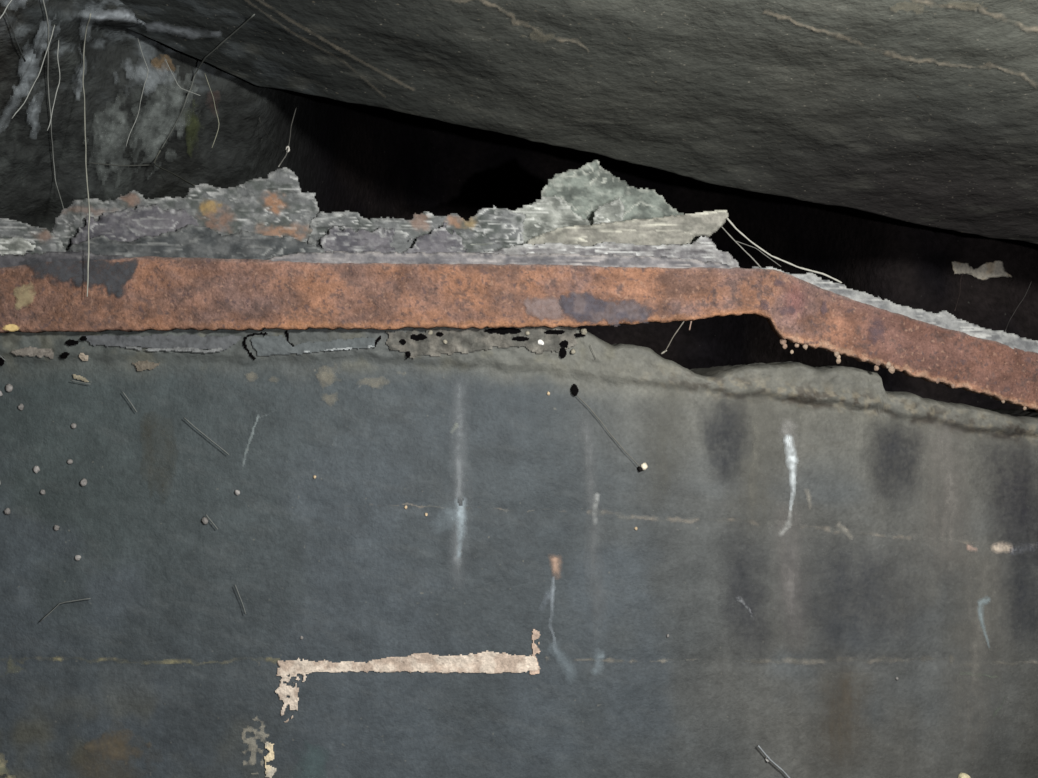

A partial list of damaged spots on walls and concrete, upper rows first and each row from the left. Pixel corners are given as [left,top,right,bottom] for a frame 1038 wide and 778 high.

rust [0,160,1038,354]
spalling [952,261,1012,280]
rust [867,360,895,374]
leakage [780,429,796,534]
leakage [983,543,1010,579]
peeling [275,629,541,722]
leakage [972,594,989,683]
peeling [242,725,276,778]